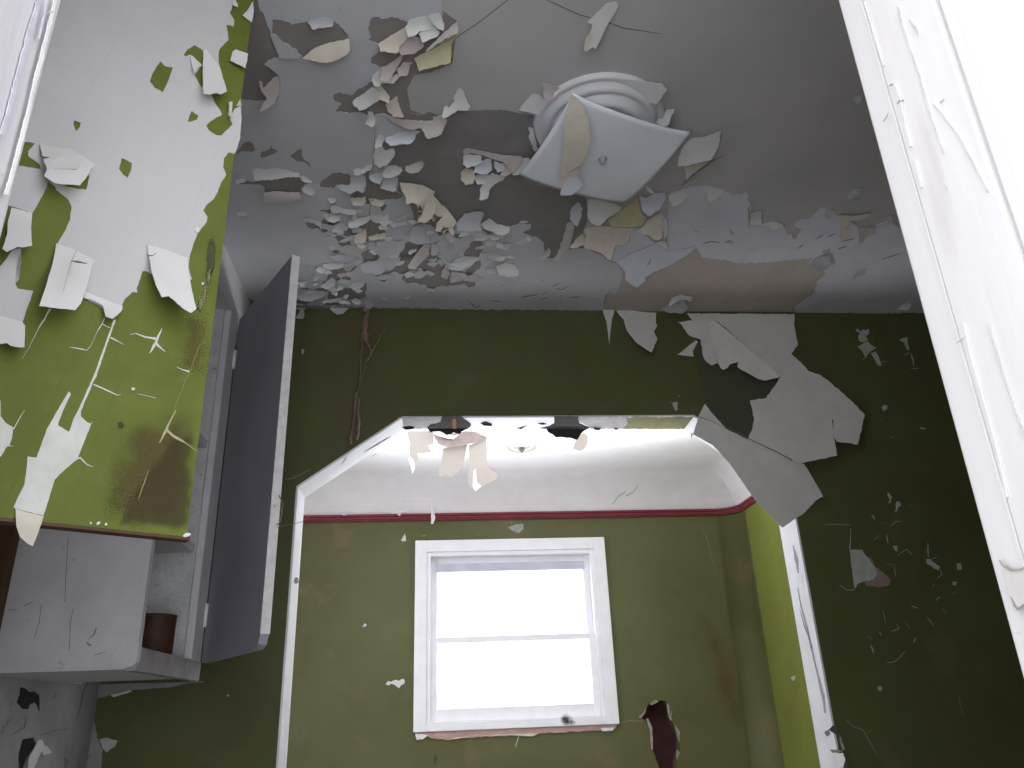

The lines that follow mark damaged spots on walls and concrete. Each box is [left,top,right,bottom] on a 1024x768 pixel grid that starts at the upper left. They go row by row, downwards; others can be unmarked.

peeling [0,0,924,348]
crack [70,317,204,452]
spalling [427,416,492,439]
spalling [518,416,618,440]
water stain [116,425,190,526]
peeling [15,509,44,546]
flaking render [17,687,40,711]
flaking render [19,738,52,768]
peeling [99,737,118,753]
spalling [638,700,680,768]